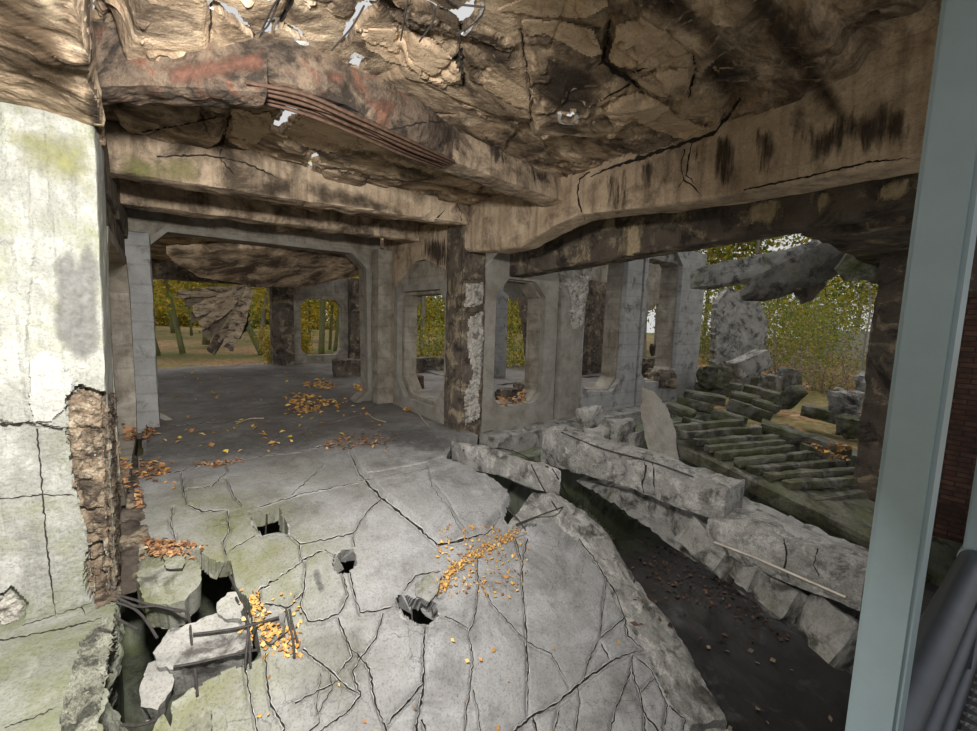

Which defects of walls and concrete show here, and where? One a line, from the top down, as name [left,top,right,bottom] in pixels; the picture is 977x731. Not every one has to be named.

crack [142,113,279,179]
flaking render [359,6,462,85]
flaking render [498,0,706,140]
crack [598,20,648,101]
crack [576,97,741,221]
damp [716,138,734,185]
crack [744,157,910,191]
damp [752,0,904,158]
spalling [464,282,484,425]
crack [0,420,102,641]
spalling [28,353,299,731]
crack [165,413,686,731]